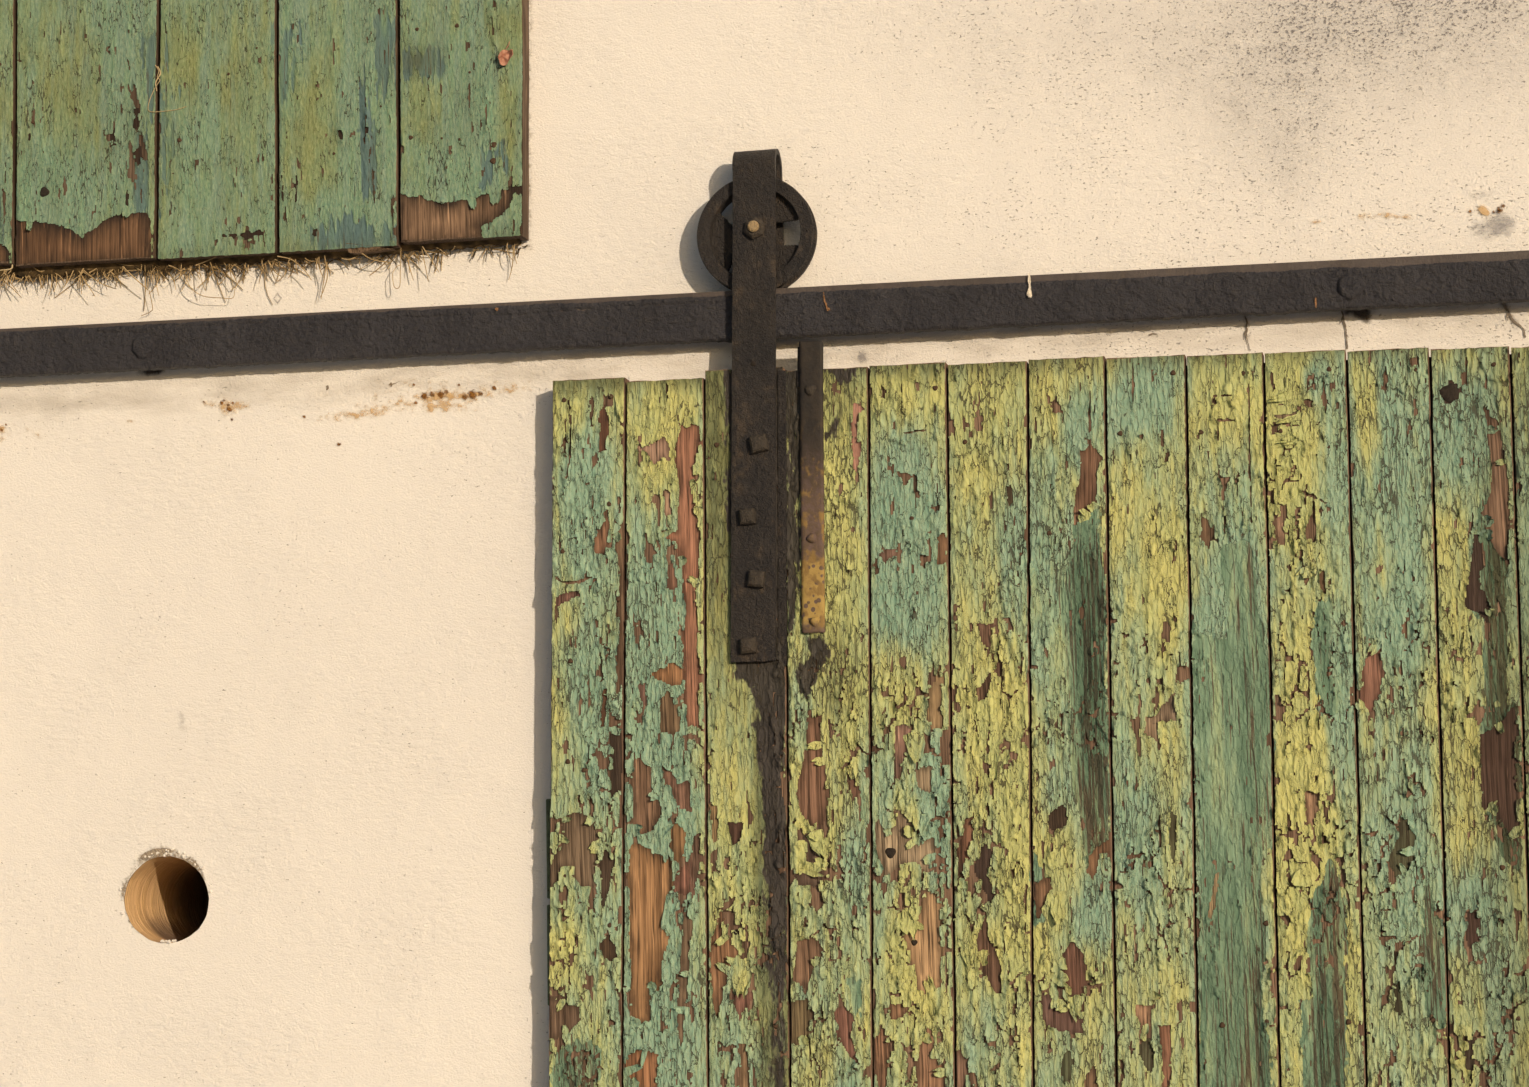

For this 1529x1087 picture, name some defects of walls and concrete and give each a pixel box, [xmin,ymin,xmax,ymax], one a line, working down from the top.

water stain [1134,0,1529,182]
rust [335,381,517,418]